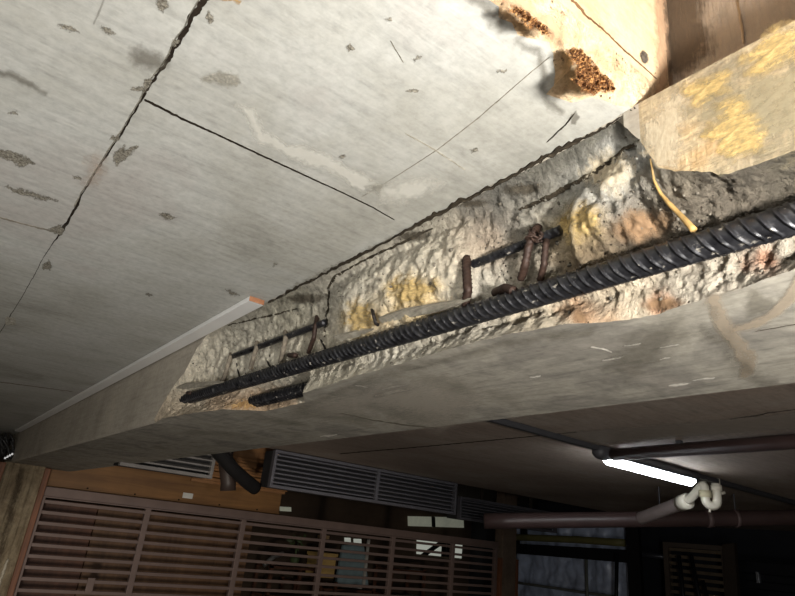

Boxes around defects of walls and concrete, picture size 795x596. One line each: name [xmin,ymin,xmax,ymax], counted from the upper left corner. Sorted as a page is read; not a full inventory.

crack [571,0,657,79]
damp [663,0,708,77]
damp [701,63,795,143]
crack [0,0,640,337]
spalling [154,122,795,423]